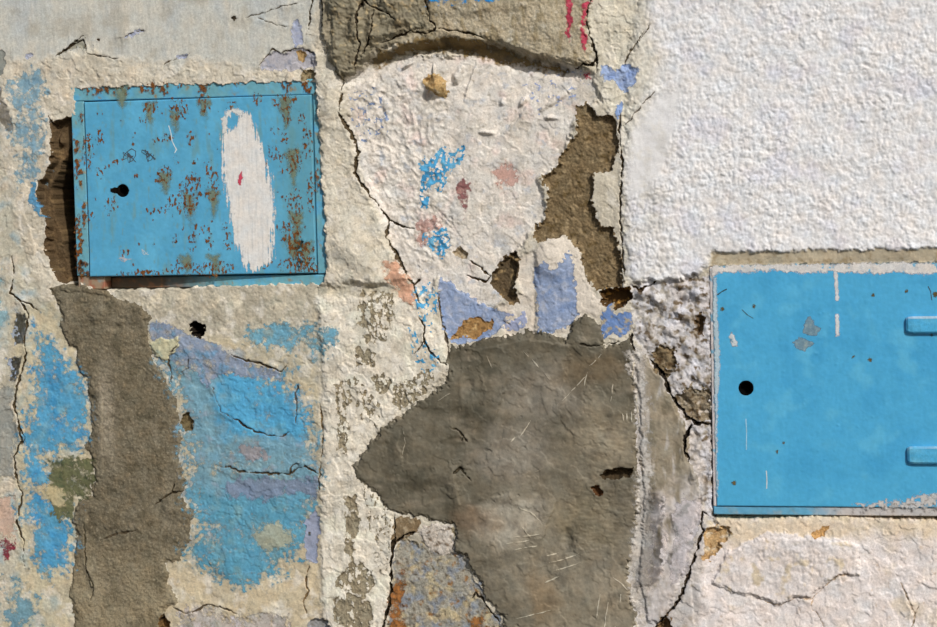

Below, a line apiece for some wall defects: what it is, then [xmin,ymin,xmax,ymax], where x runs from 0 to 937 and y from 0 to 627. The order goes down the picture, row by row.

crack [338,0,486,365]
peeling [523,64,639,311]
crack [466,261,491,283]
crack [9,256,37,562]
spalling [180,412,194,432]
crack [212,354,299,437]
crack [224,406,324,493]
peeling [333,250,521,455]
crack [580,333,711,461]
crack [656,511,706,627]
crack [755,574,852,624]